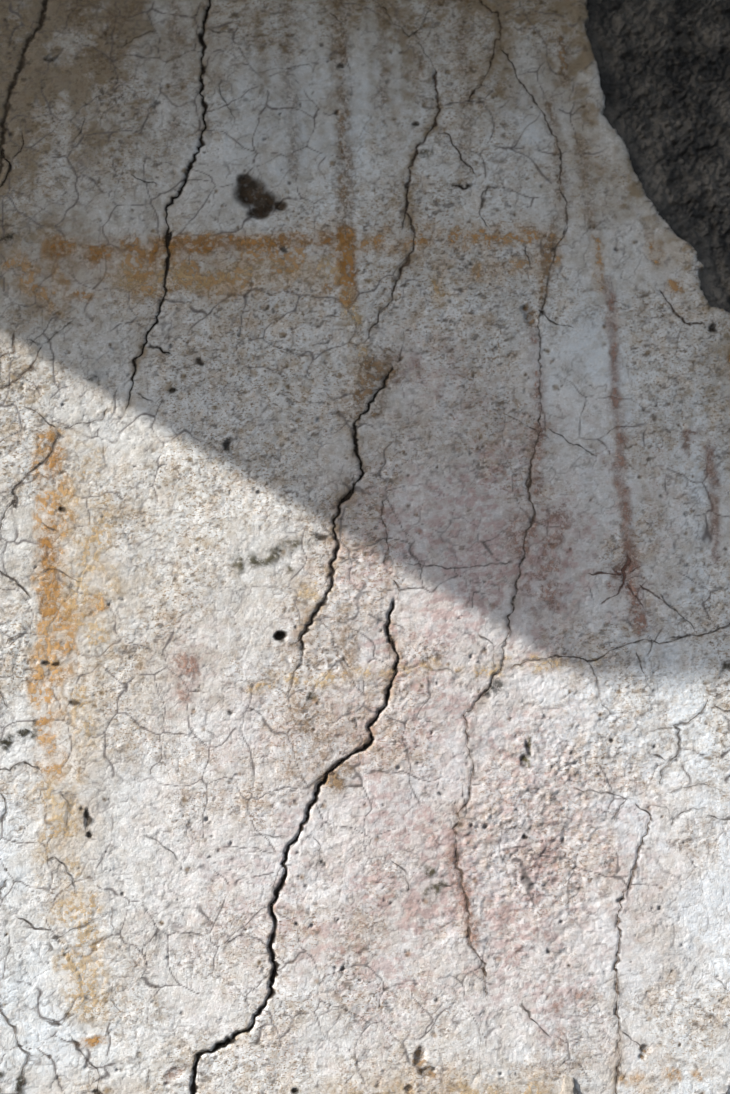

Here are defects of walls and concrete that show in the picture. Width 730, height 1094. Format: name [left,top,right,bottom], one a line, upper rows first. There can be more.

crack [0,0,225,541]
corrosion [88,233,341,295]
crack [368,70,497,337]
corrosion [448,229,562,268]
flaking render [585,0,730,313]
corrosion [28,431,109,777]
crack [288,352,401,693]
crack [438,0,730,996]
crack [0,1005,30,1094]
crack [18,909,113,952]
crack [190,501,409,1094]
crack [576,693,730,1094]